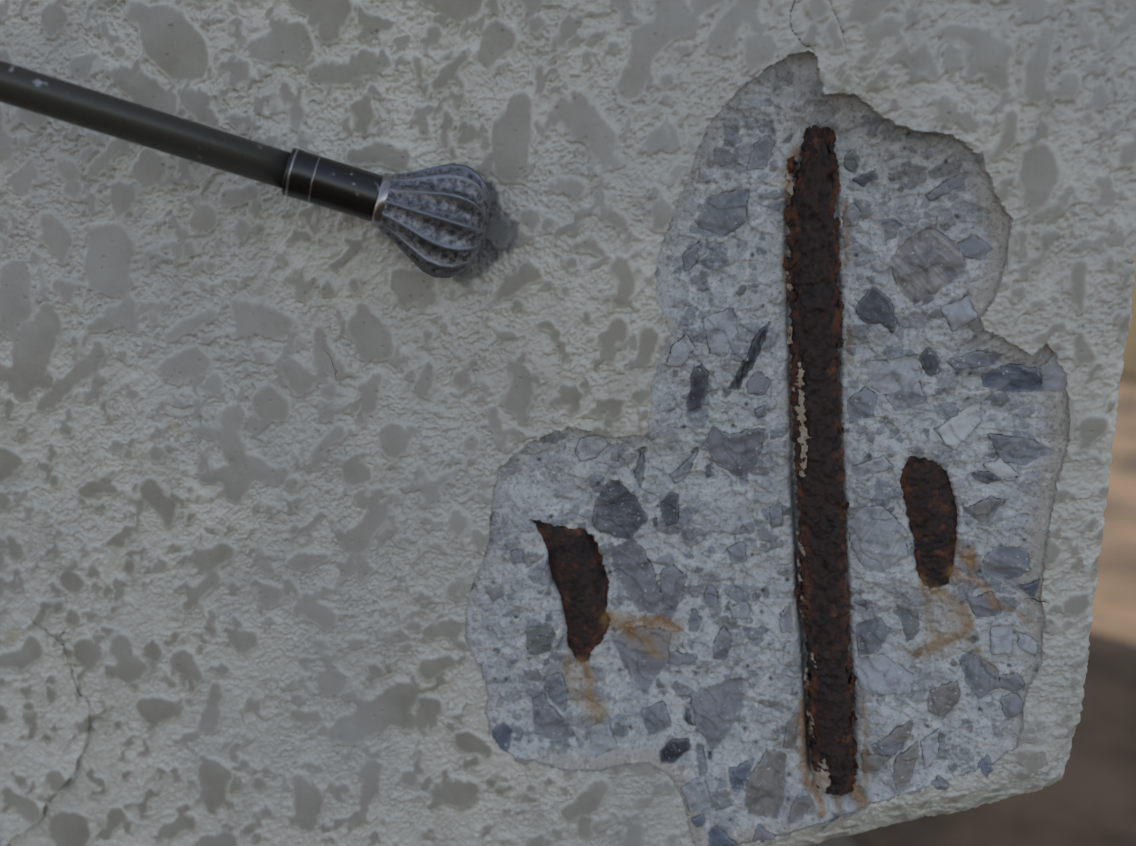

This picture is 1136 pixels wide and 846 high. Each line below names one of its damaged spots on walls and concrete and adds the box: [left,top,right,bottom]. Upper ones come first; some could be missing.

rust [787,156,798,173]
rust [782,237,795,271]
spalling [464,50,1075,846]
rust [793,585,807,610]